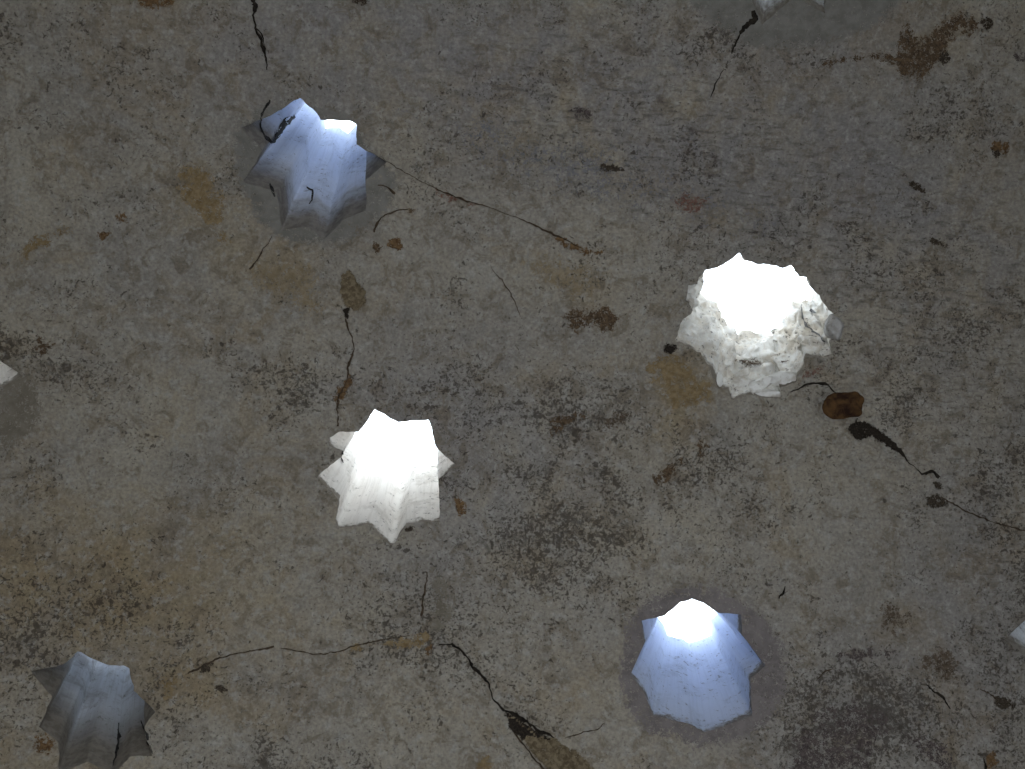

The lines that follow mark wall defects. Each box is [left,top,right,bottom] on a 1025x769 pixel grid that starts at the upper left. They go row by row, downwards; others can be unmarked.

rust [138,0,175,10]
crack [711,10,758,96]
rust [819,11,983,82]
crack [336,319,355,426]
crack [791,382,837,394]
crack [881,433,1025,531]
crack [187,572,428,674]
crack [439,643,604,769]